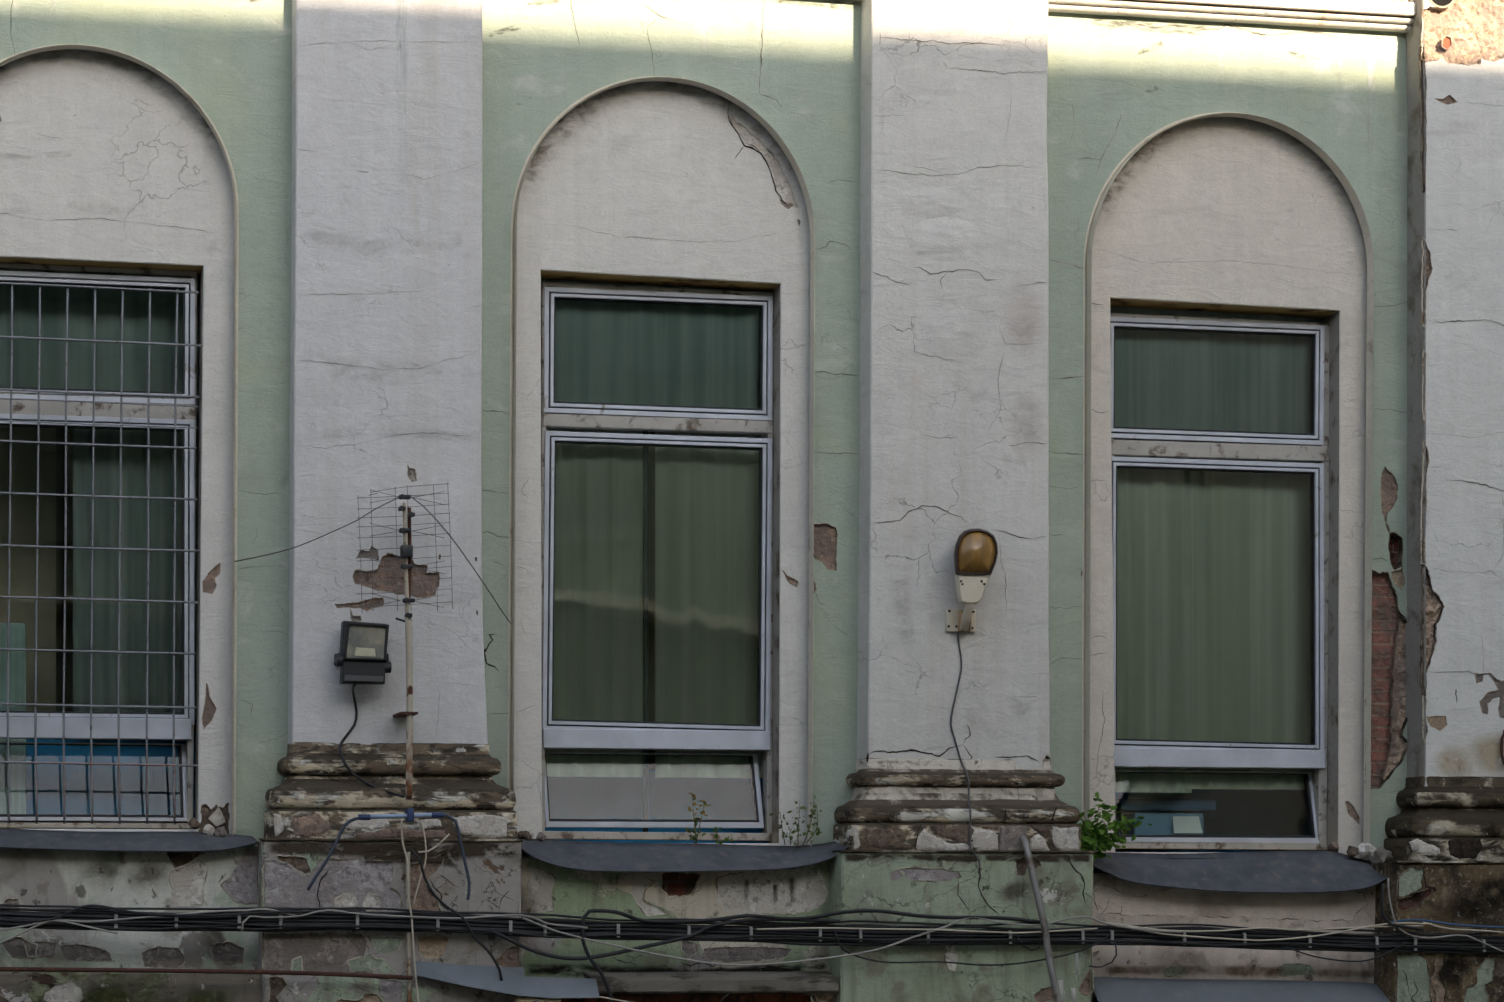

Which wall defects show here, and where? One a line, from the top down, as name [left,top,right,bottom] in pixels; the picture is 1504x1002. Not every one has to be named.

crack [548,4,787,243]
crack [827,35,1046,183]
flaking render [1418,0,1504,193]
flaking render [335,545,441,621]
crack [845,505,1060,636]
crack [866,606,1107,762]
flaking render [1363,439,1448,789]
crack [1406,480,1504,611]
crack [1429,637,1499,699]
peeling [167,813,507,912]
peeling [210,932,449,1002]
flaking render [561,992,839,1002]